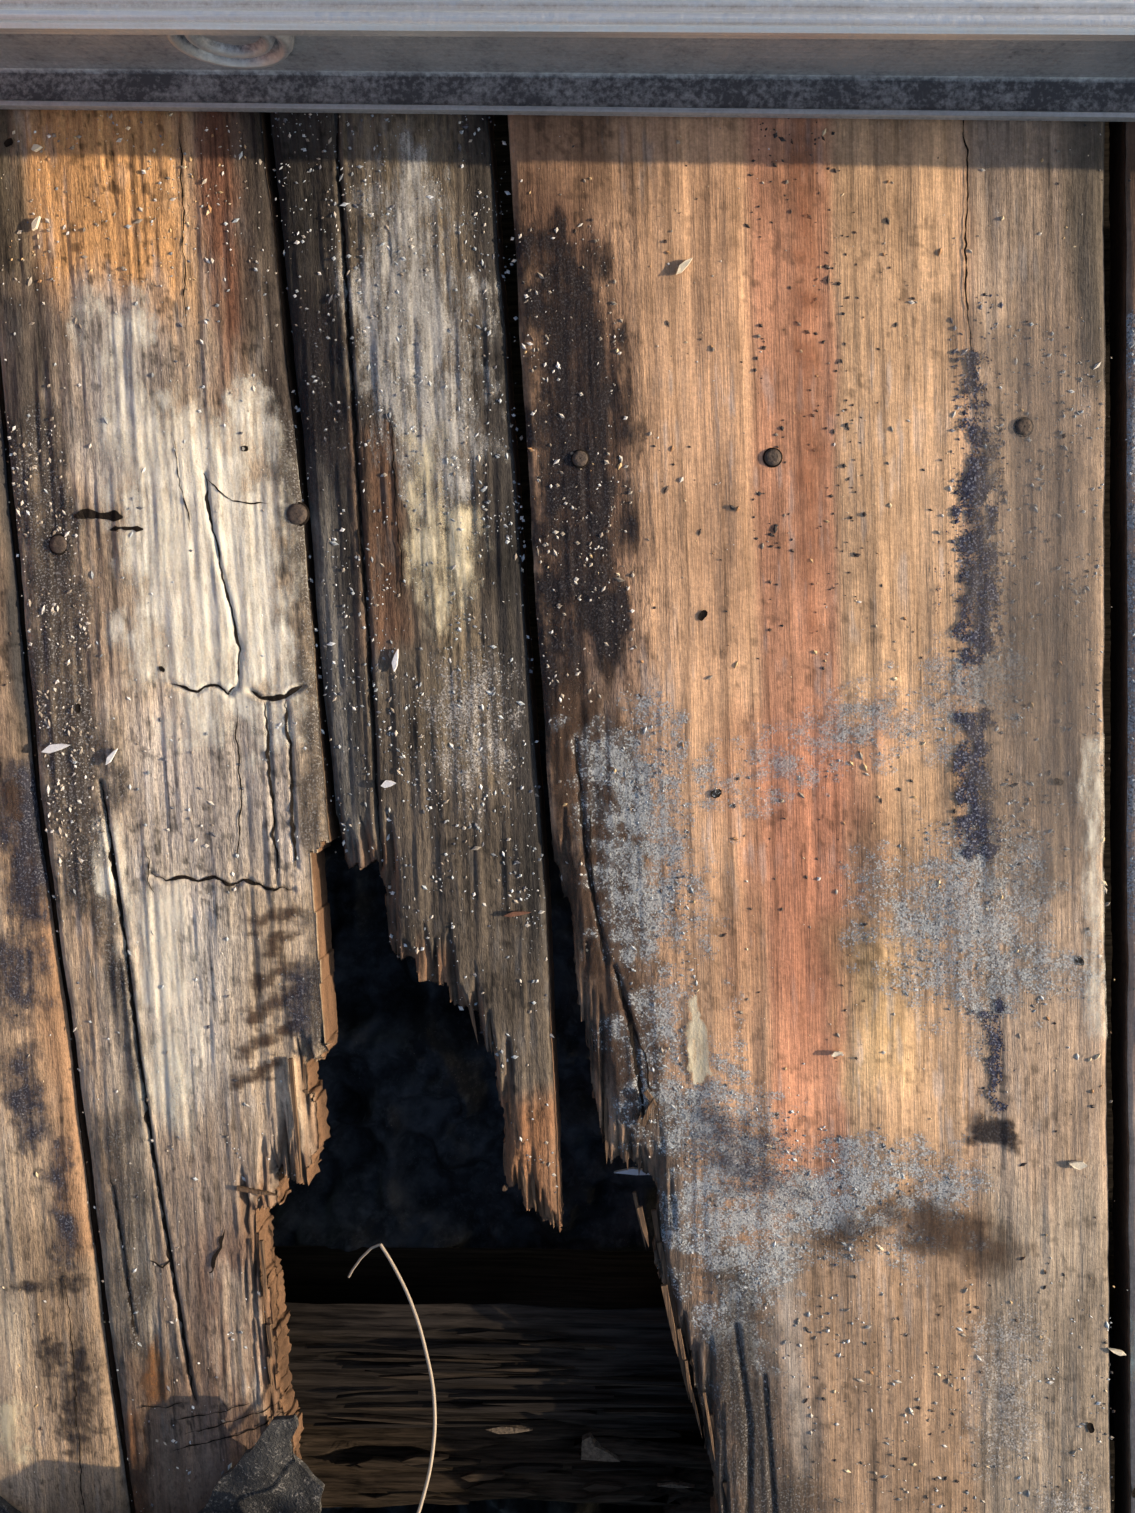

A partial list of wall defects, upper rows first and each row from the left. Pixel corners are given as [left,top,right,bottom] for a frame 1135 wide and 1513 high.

water stain [0,401,187,1116]
crack [74,509,143,532]
water stain [71,131,496,875]
water stain [415,207,666,1151]
water stain [934,334,1102,875]
water stain [3,1043,81,1294]
crack [100,441,302,1450]
water stain [232,907,327,1089]
water stain [681,1086,814,1213]
water stain [972,997,1016,1118]
water stain [41,1339,97,1455]
water stain [703,1305,827,1513]